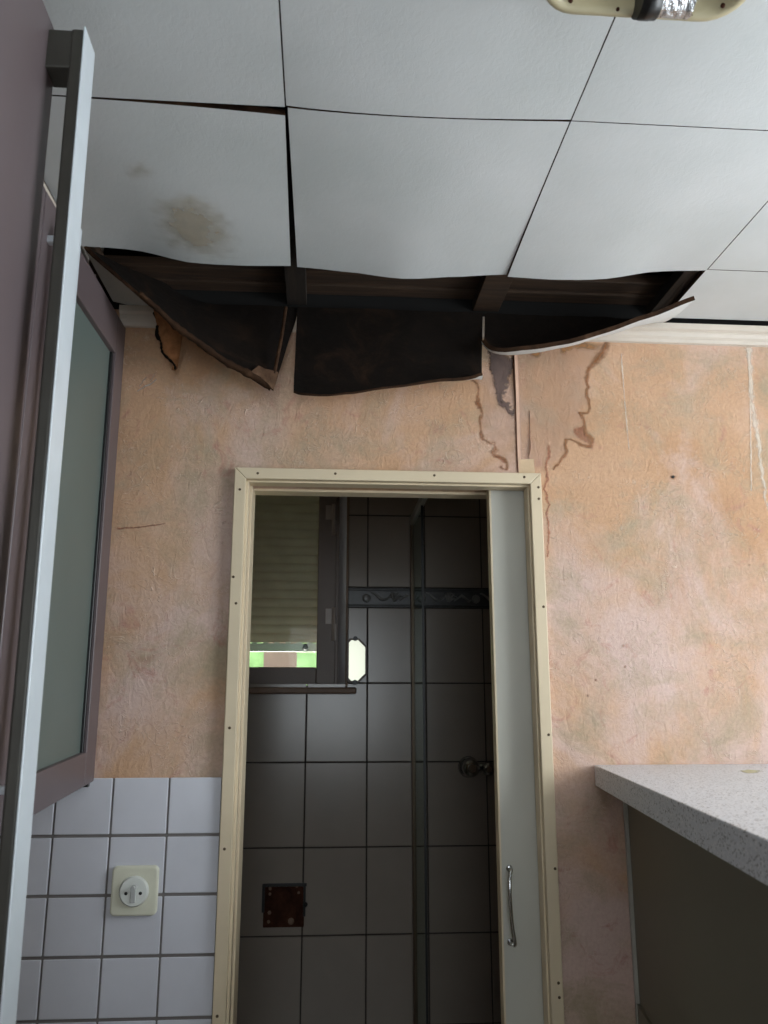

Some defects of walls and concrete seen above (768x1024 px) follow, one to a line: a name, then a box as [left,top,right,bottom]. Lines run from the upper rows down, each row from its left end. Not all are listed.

leakage [474,381,508,470]
leakage [488,351,515,415]
leakage [543,343,608,557]